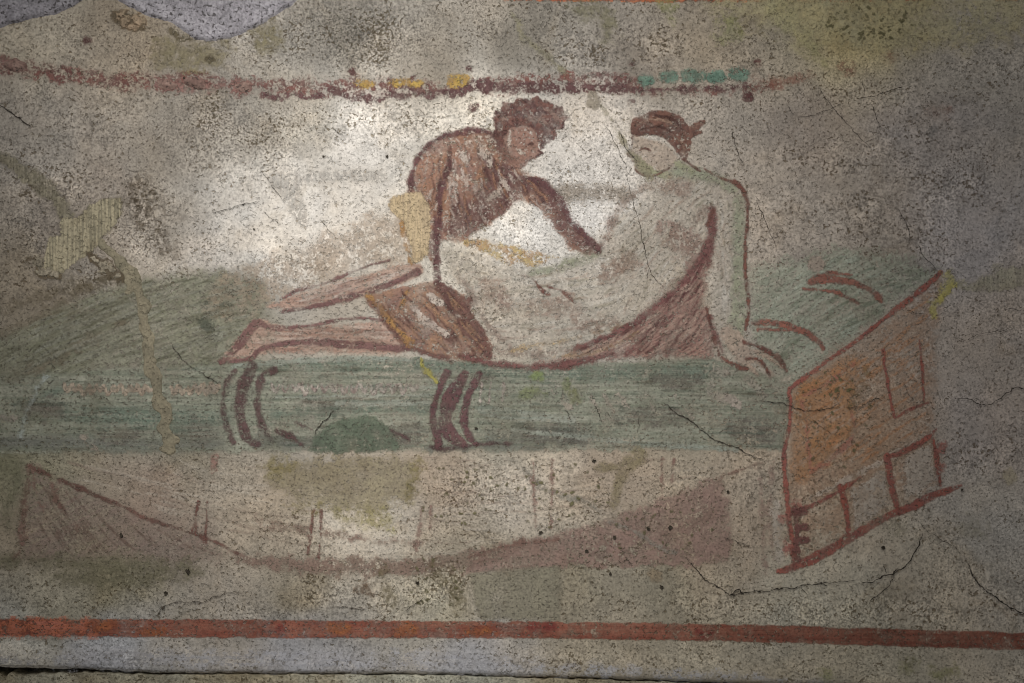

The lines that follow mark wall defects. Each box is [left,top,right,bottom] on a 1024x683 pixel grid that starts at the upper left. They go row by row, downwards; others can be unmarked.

spalling [110,7,147,32]
crack [664,403,766,461]
crack [753,398,880,433]
crack [621,521,1024,614]